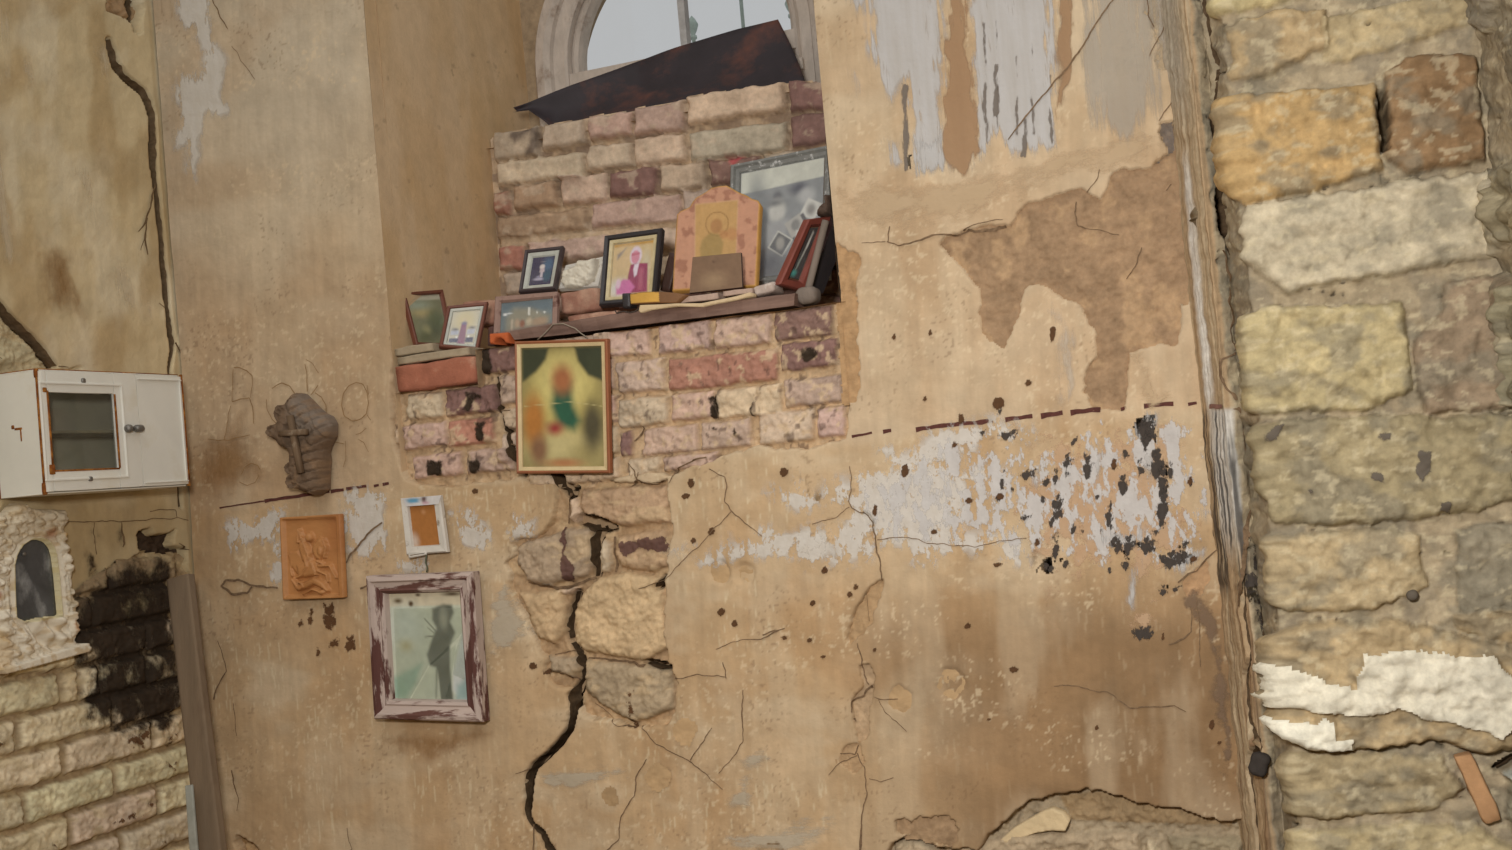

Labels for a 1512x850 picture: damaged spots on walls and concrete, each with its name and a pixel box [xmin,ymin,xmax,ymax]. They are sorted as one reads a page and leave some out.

crack [1202,0,1222,135]
peeling [0,318,47,373]
crack [0,302,66,368]
crack [105,0,181,374]
peeling [940,122,1189,411]
peeling [1024,424,1210,597]
crack [1168,187,1265,850]
flaking render [0,530,190,850]
crack [497,377,785,850]
peeling [1001,806,1071,842]
peeling [1134,613,1164,640]
crack [1494,753,1512,768]